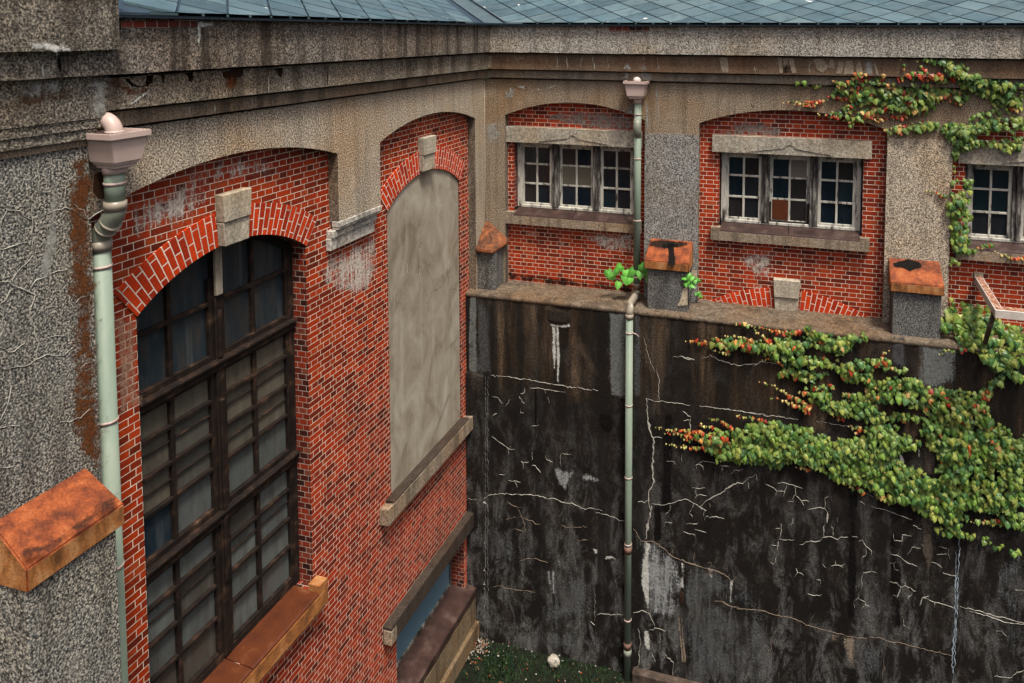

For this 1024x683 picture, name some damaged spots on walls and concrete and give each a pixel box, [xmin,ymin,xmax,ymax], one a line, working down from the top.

efflorescence [326,236,374,291]
rust [63,159,102,472]
leakage [469,297,490,377]
efflorescence [551,324,570,381]
leakage [610,313,654,397]
leakage [918,346,956,388]
efflorescence [555,469,598,488]
leakage [641,414,775,682]
crack [469,340,1023,683]
leakage [846,493,860,617]
leakage [890,530,902,628]
leakage [832,634,880,673]